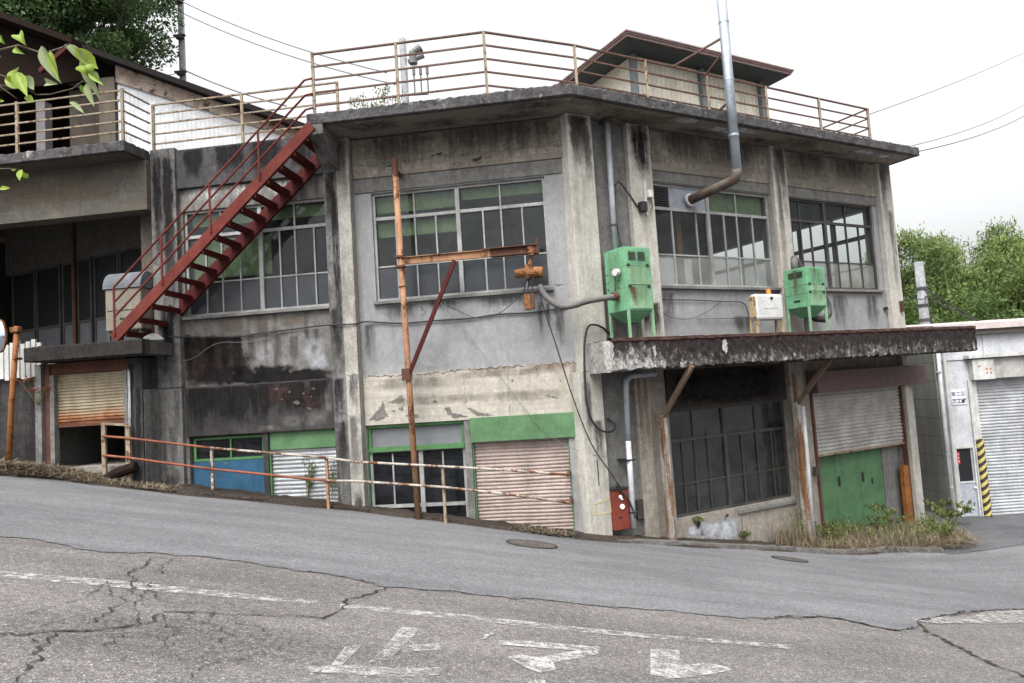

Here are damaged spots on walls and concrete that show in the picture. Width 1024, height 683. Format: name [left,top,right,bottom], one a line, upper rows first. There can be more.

water stain [598,109,662,166]
water stain [153,158,174,272]
water stain [325,144,344,349]
water stain [645,293,673,330]
water stain [161,305,354,429]
water stain [339,417,356,458]
peeling [369,395,419,421]
peeling [432,400,492,418]
water stain [688,519,738,540]
crack [0,553,387,683]
crack [765,608,1024,676]